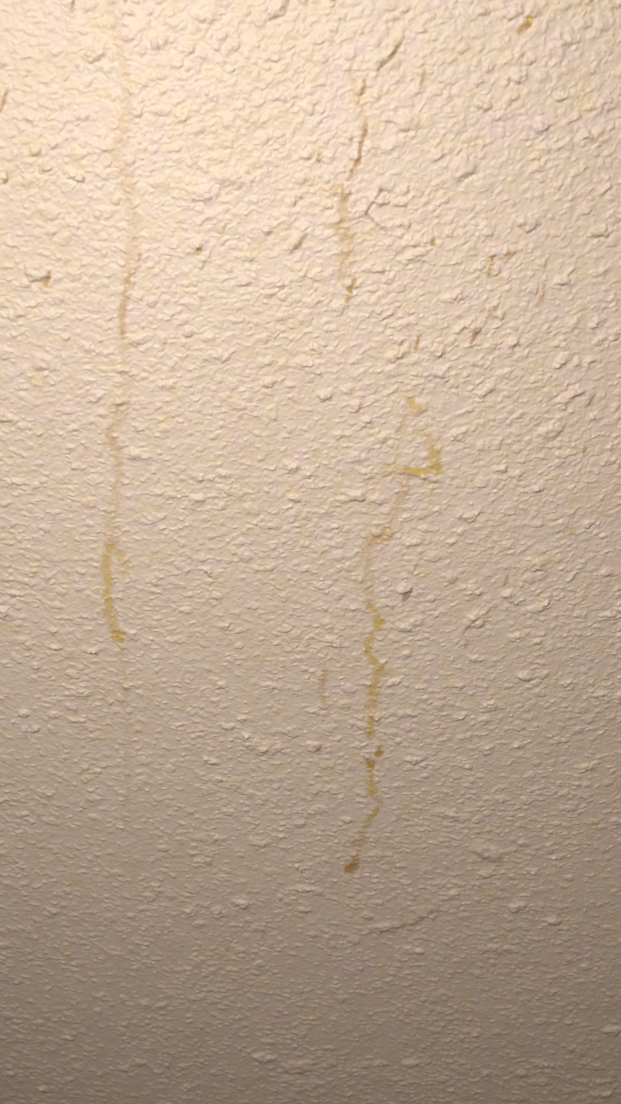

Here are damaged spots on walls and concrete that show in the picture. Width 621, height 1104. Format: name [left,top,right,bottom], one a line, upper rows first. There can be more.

leakage [404,453,439,476]